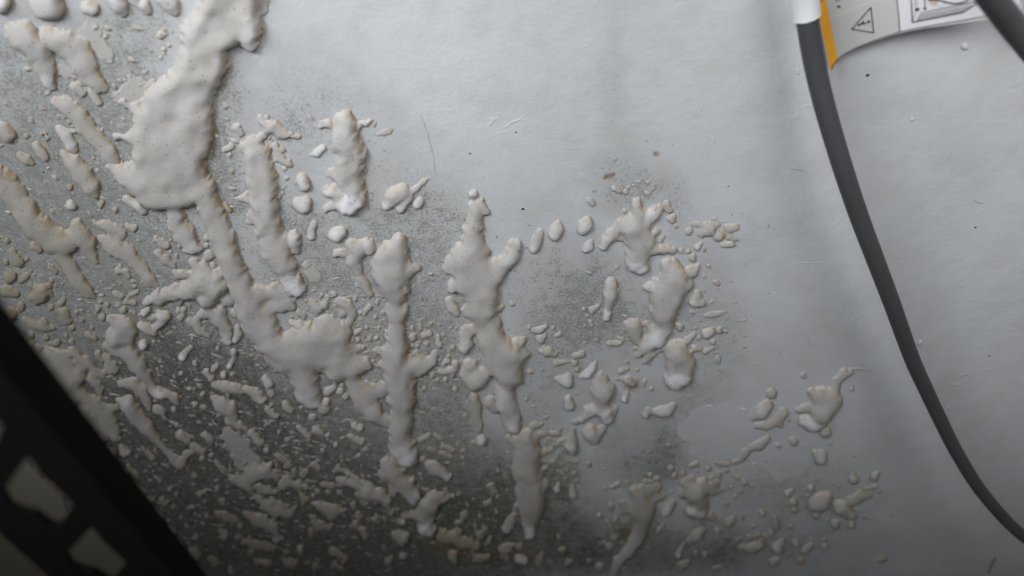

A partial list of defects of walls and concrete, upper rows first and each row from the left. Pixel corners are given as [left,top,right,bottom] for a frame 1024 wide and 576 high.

water stain [0,0,741,576]